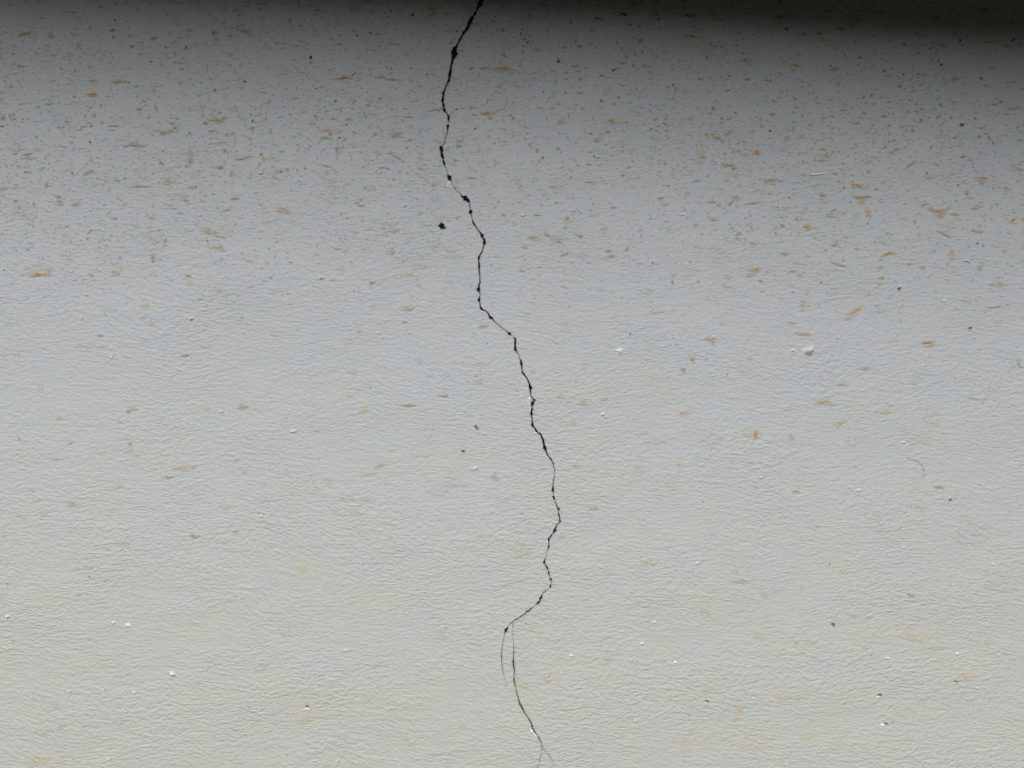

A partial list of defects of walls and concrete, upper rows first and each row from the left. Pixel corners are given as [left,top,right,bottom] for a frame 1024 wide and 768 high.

crack [428,0,561,768]